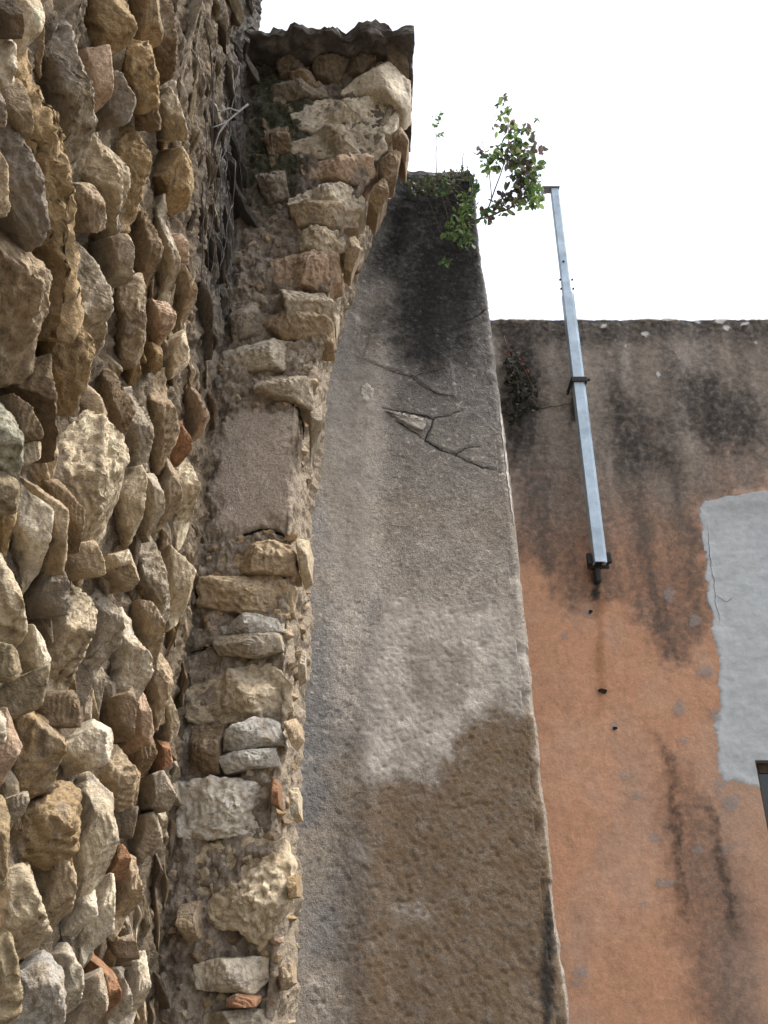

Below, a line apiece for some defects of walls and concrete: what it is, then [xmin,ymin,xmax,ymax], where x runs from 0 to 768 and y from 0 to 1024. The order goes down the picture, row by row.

damp [367,173,484,368]
crack [367,360,489,469]
damp [497,320,768,658]
damp [358,595,567,1024]